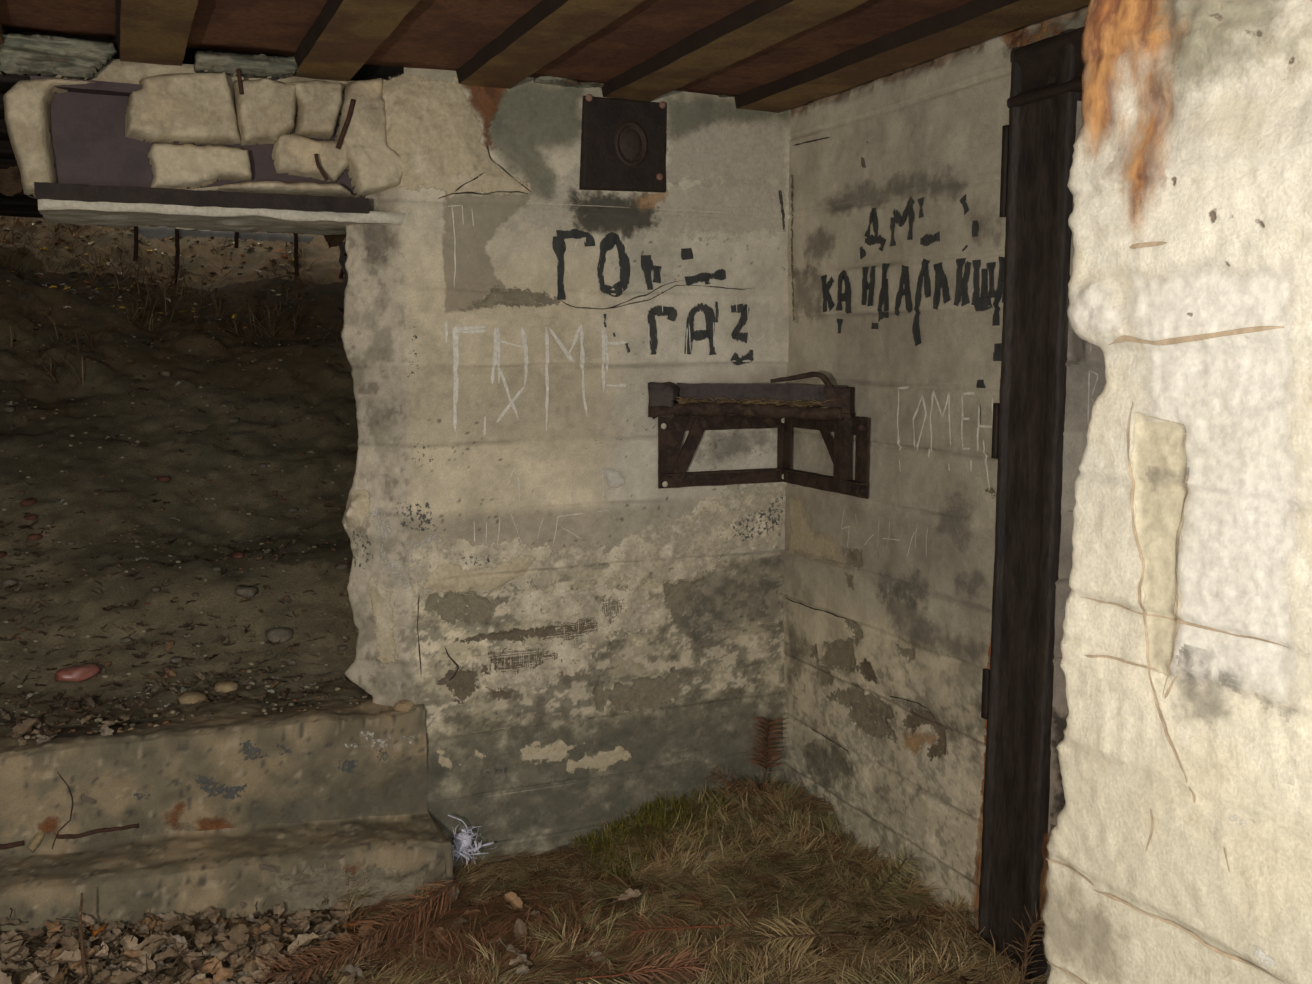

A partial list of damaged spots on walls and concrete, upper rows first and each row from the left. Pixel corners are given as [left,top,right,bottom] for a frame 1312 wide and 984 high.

damp [488,85,582,197]
damp [670,100,766,135]
rust [1081,0,1173,141]
rust [1125,74,1171,218]
peeling [396,482,787,704]
peeling [842,547,863,590]
spalling [592,666,681,713]
peeling [810,619,949,761]
peeling [436,749,507,780]
peeling [520,739,632,774]